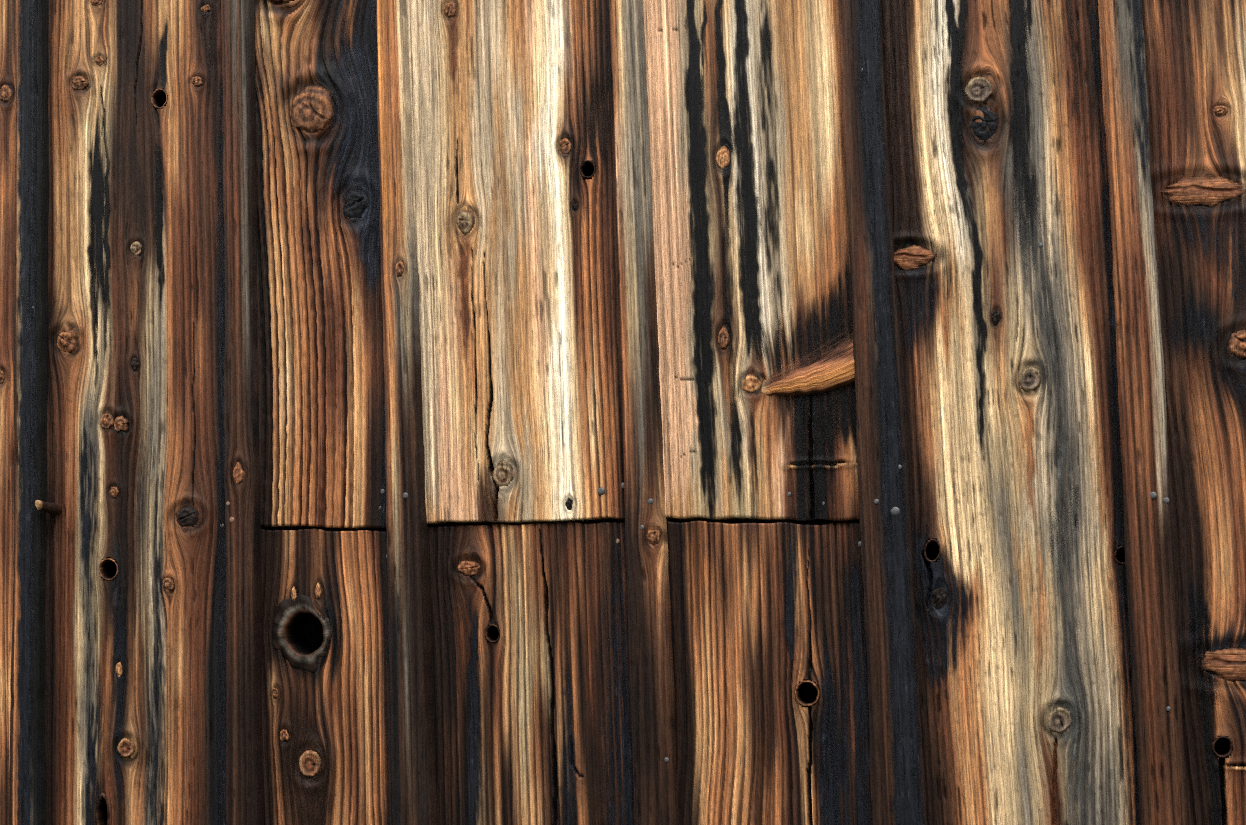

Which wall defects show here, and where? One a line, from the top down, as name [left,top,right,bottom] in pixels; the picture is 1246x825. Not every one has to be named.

crack [471,250,499,521]
crack [790,394,858,520]
crack [470,576,493,624]
crack [539,529,584,825]
crack [806,552,814,825]
crack [1051,739,1059,825]